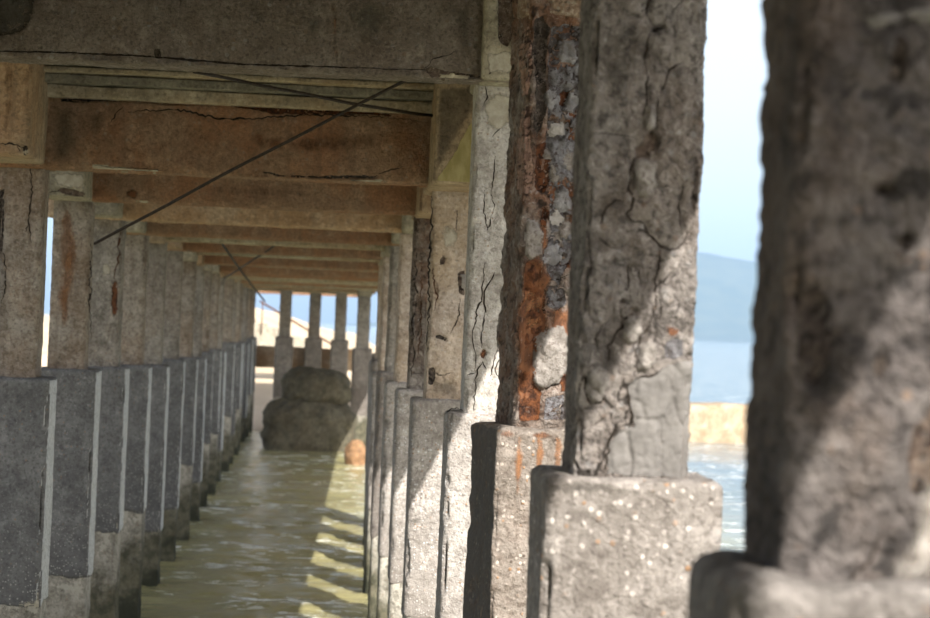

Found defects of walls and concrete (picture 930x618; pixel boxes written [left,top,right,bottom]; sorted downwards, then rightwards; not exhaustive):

crack [111,108,418,122]